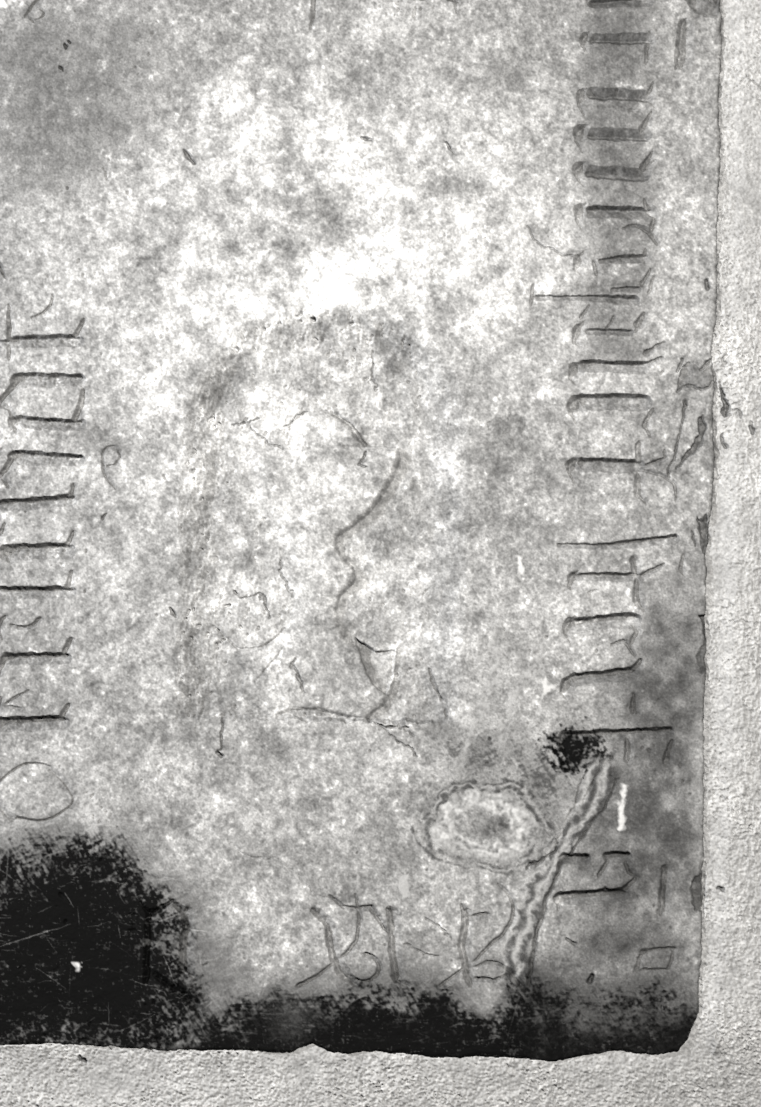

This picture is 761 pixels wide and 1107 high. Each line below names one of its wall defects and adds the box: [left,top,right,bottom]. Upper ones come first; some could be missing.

crack [357,451,370,469]
water stain [0,833,697,1061]
crack [525,761,621,992]